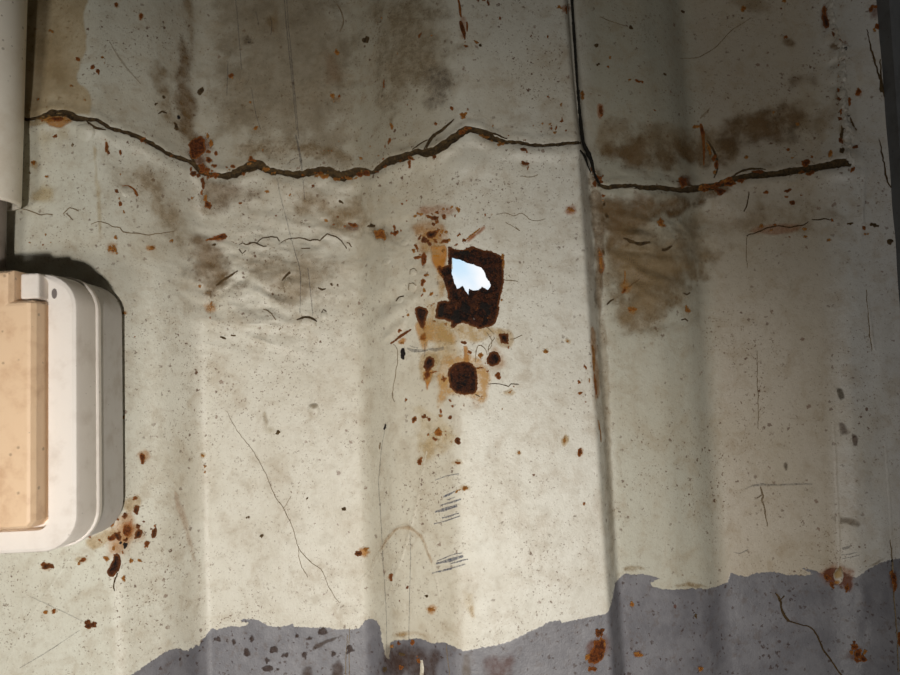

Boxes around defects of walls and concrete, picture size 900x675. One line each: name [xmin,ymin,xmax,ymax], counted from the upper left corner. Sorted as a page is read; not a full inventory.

rust [188,133,235,209]
crack [24,0,852,212]
leakage [602,111,807,166]
leakage [590,193,704,322]
crack [746,218,831,268]
rust [324,206,509,445]
rust [88,496,157,591]
crack [775,593,842,675]